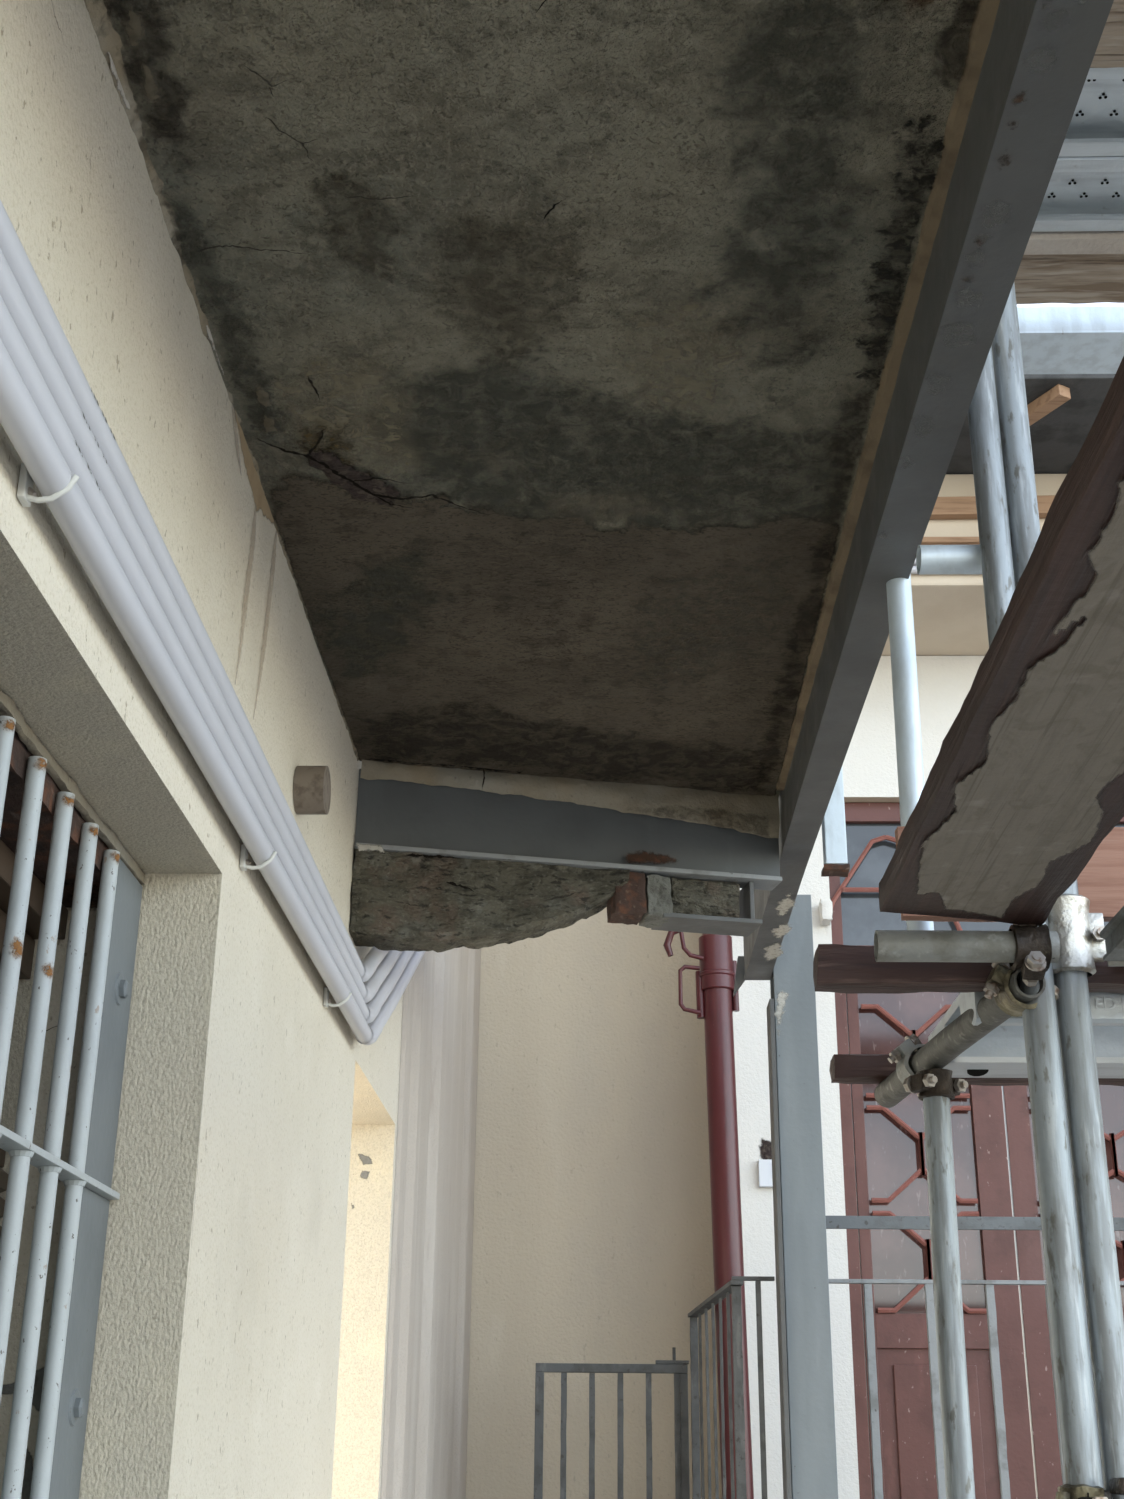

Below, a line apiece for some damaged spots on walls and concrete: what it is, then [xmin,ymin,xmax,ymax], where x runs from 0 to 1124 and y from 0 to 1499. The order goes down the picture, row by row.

damp [85,0,188,143]
crack [257,377,499,514]
damp [165,0,945,792]
rust [11,939,23,959]
rust [67,883,99,908]